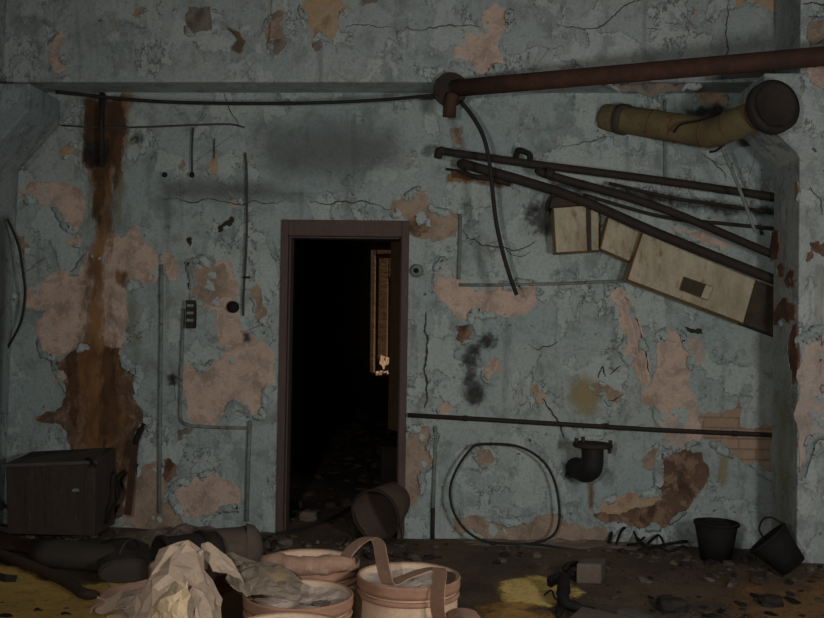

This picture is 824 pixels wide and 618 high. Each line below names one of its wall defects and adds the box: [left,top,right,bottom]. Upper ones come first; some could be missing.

spalling [262,9,287,55]
peeling [297,0,353,51]
crack [346,23,478,31]
peeling [453,4,516,77]
crack [557,0,639,30]
crack [723,0,731,55]
peeling [389,186,458,242]
rust [65,93,132,449]
peeling [432,256,537,345]
peeling [11,181,277,530]
peeling [769,229,824,484]
spalling [452,327,772,541]